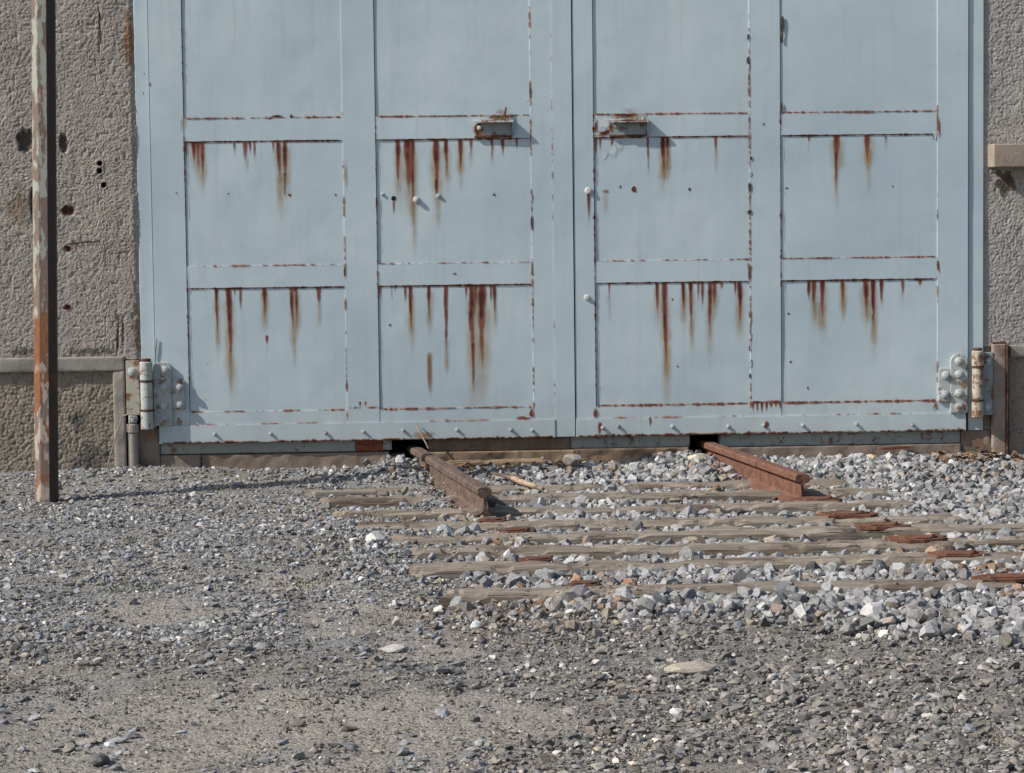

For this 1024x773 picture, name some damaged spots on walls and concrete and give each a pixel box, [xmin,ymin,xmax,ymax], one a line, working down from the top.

rust [183,137,340,181]
rust [375,114,532,207]
rust [779,105,940,181]
rust [587,49,752,371]
rust [186,237,346,380]
rust [377,260,533,377]
rust [780,250,939,321]
rust [578,367,984,448]